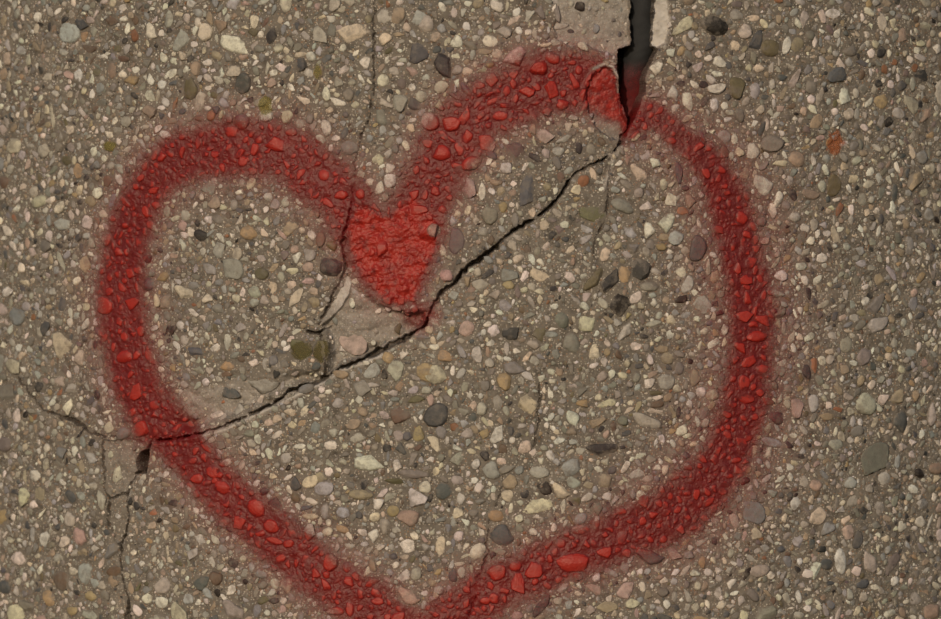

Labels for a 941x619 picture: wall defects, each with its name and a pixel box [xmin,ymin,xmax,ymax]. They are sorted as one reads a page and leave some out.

spalling [552,0,631,141]
spalling [651,0,672,48]
crack [18,0,658,619]